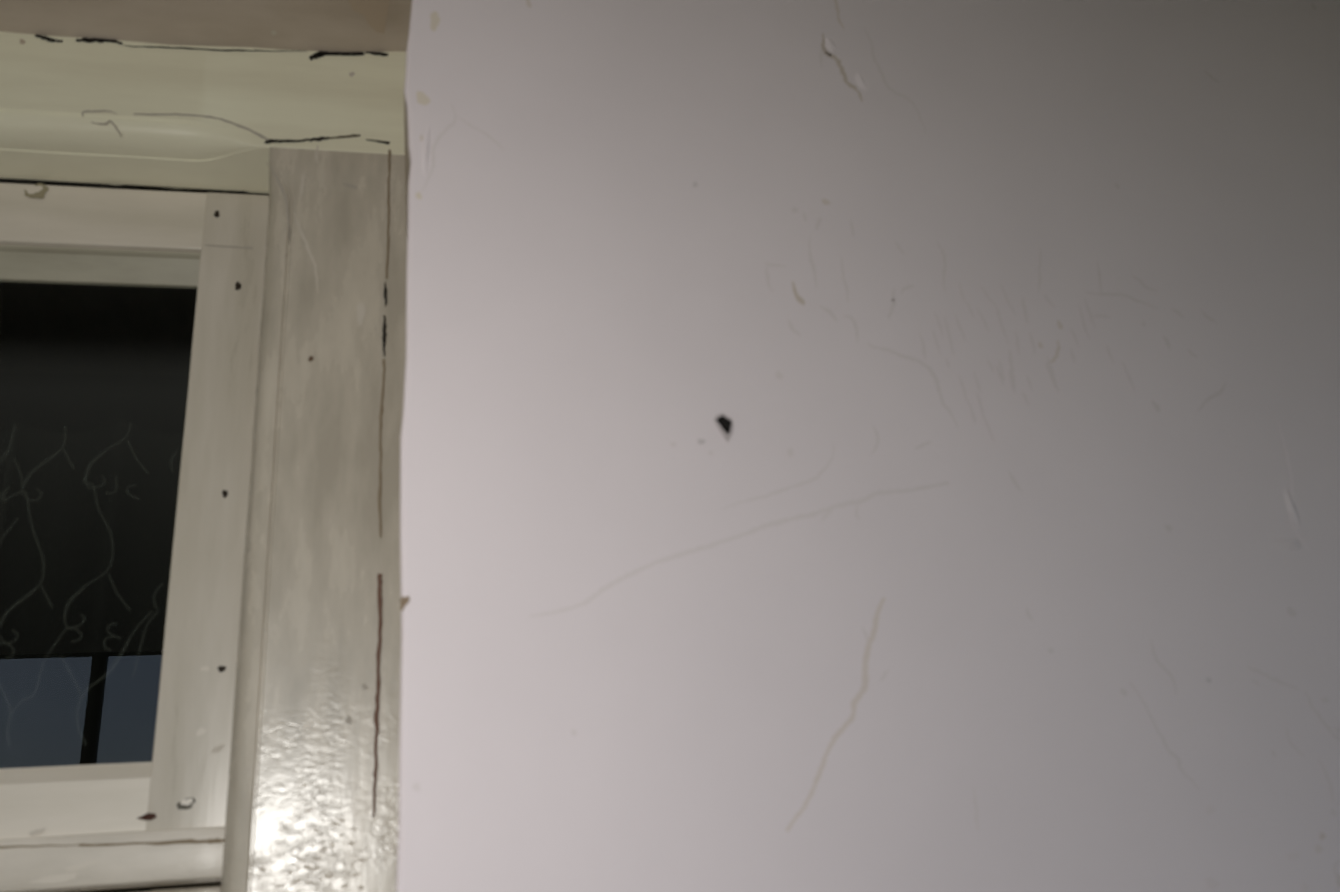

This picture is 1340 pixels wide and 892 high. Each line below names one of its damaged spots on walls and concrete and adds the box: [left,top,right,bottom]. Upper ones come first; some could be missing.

crack [821,33,863,102]
crack [786,597,886,832]